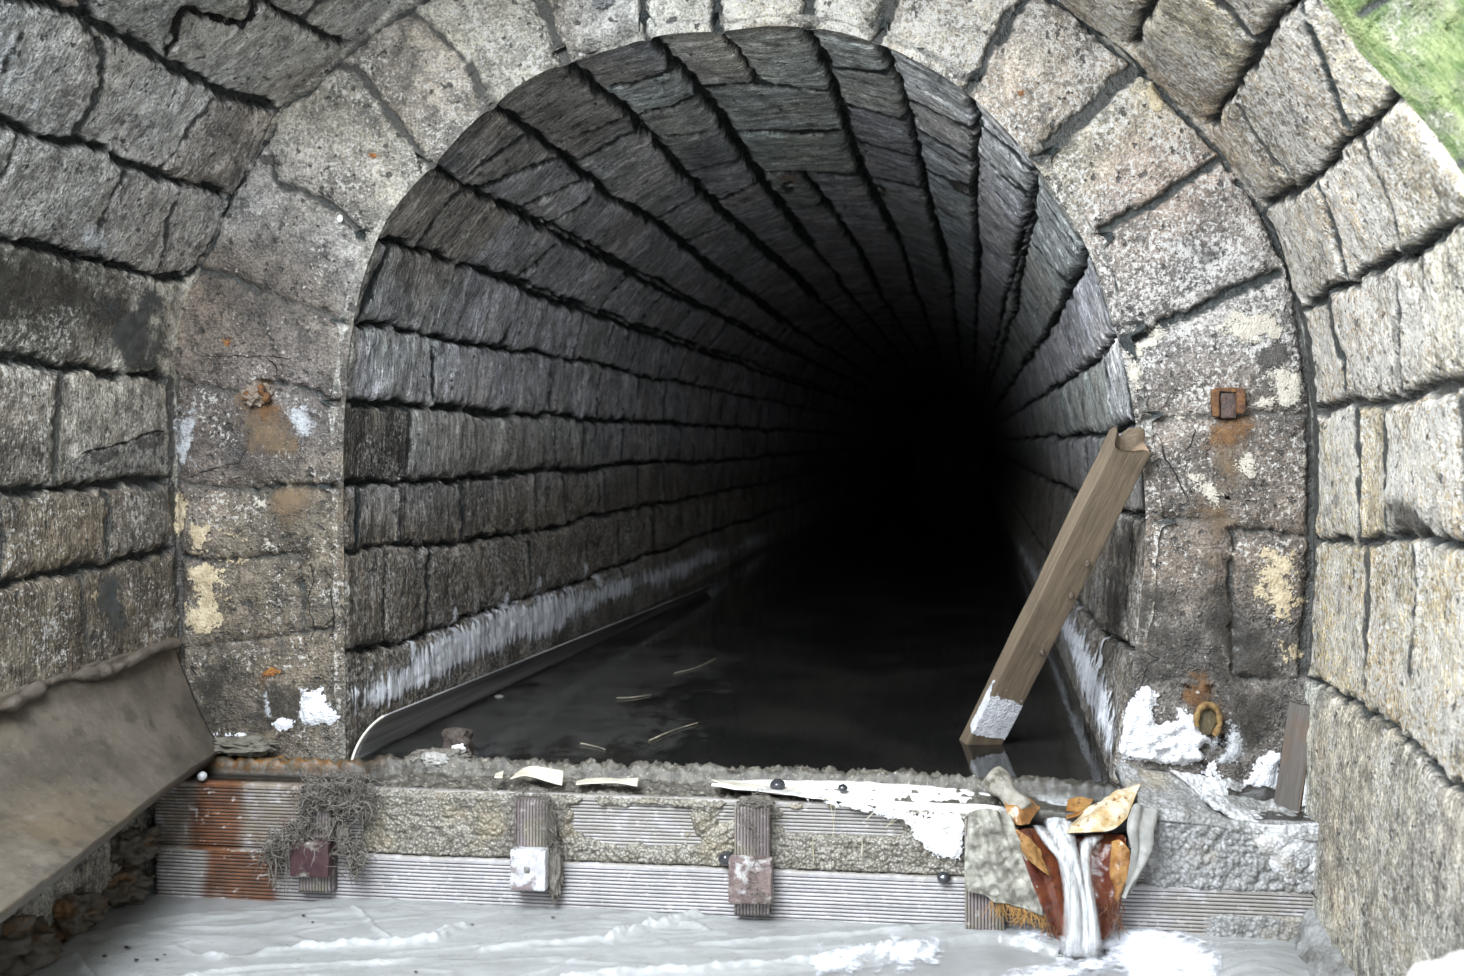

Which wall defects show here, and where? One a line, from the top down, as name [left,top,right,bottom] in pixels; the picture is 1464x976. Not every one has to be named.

rust [1210,416,1252,473]
rust [272,489,309,514]
leakage [258,532,777,732]
leakage [198,663,226,716]
leakage [1061,522,1319,885]